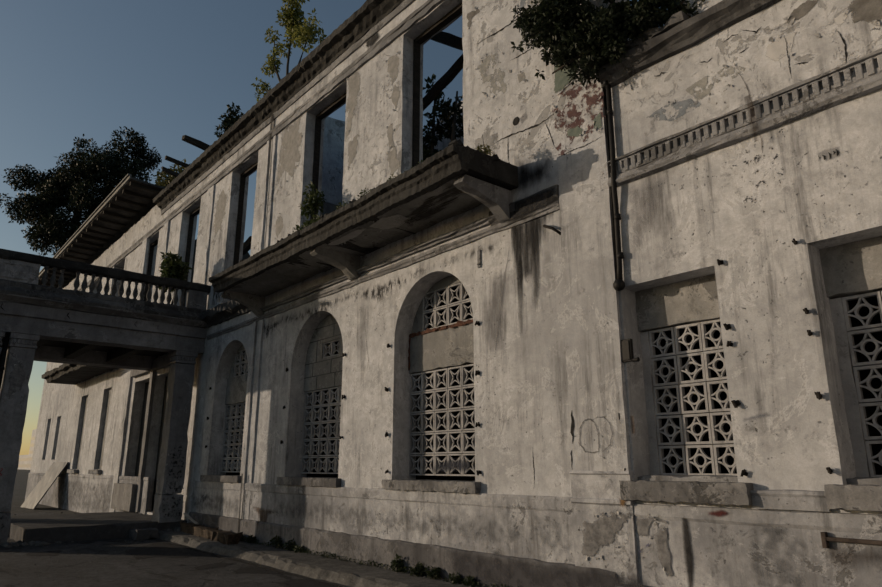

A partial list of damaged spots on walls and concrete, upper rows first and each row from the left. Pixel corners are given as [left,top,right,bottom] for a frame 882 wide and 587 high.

peeling [467,7,480,30]
crack [478,4,537,44]
peeling [815,0,882,38]
peeling [476,52,526,99]
crack [494,82,600,163]
peeling [552,62,604,155]
peeling [646,63,745,121]
water stain [504,165,554,299]
water stain [363,275,412,299]
spalling [578,511,672,577]